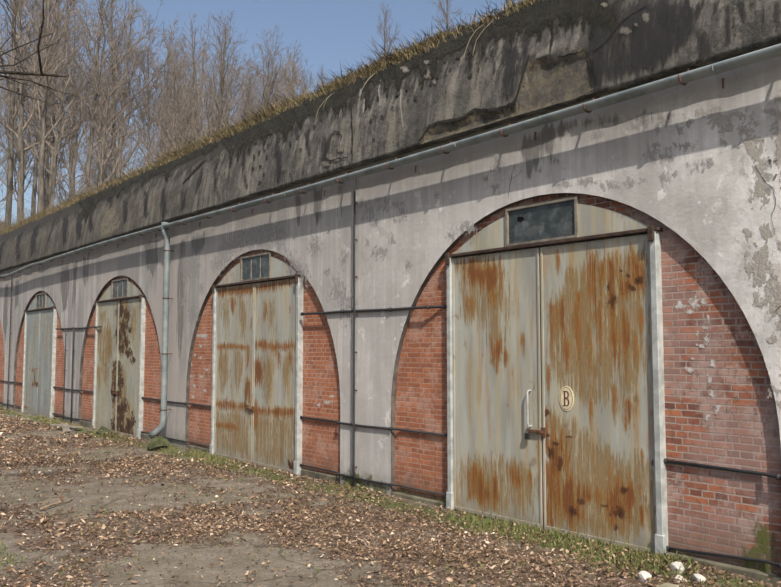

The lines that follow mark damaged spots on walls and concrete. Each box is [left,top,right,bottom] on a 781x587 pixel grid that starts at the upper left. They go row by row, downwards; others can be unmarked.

crack [414,57,529,141]
water stain [490,34,531,101]
water stain [181,158,220,209]
water stain [272,132,283,182]
water stain [295,127,330,162]
water stain [314,188,322,223]
peeling [742,222,781,344]
rust [97,300,136,435]
rust [215,279,296,470]
rust [455,244,655,544]